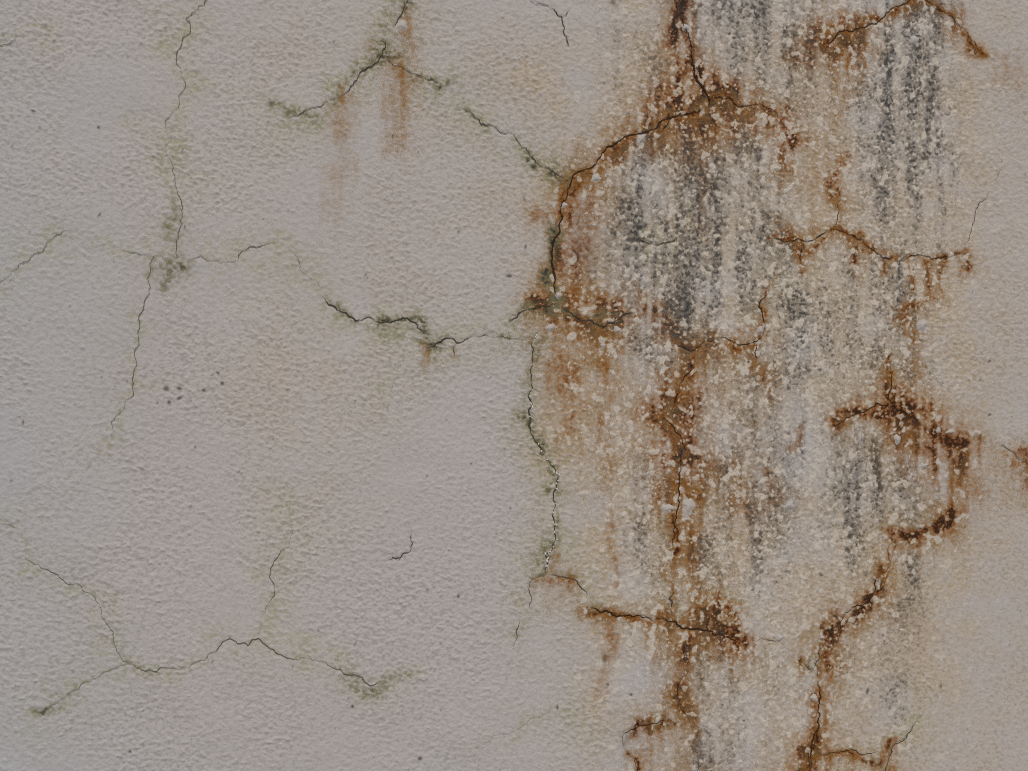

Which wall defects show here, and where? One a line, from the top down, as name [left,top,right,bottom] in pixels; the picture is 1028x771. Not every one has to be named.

water stain [692,0,768,65]
rust [782,0,988,70]
crack [822,0,988,56]
water stain [881,1,942,199]
crack [291,0,778,771]
rust [524,0,808,738]
water stain [611,138,756,340]
crack [659,173,999,559]
water stain [844,426,890,538]
crack [802,522,945,771]
rust [789,371,982,771]
rust [897,254,948,343]